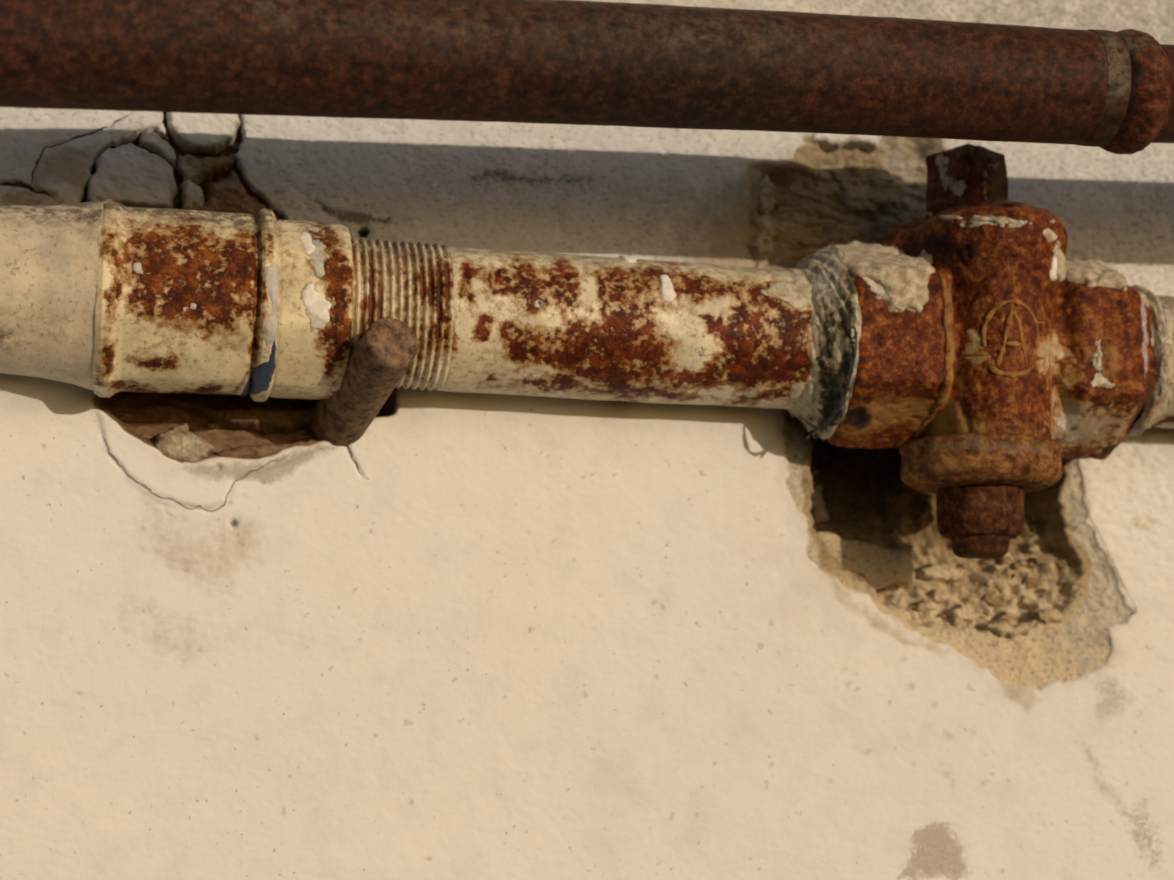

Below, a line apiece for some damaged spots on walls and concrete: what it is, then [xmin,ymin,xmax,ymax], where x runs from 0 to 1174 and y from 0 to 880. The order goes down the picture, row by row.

crack [0,112,285,220]
spalling [741,133,944,270]
crack [103,437,290,512]
spalling [93,391,322,480]
spalling [375,387,397,418]
spalling [782,409,1137,691]